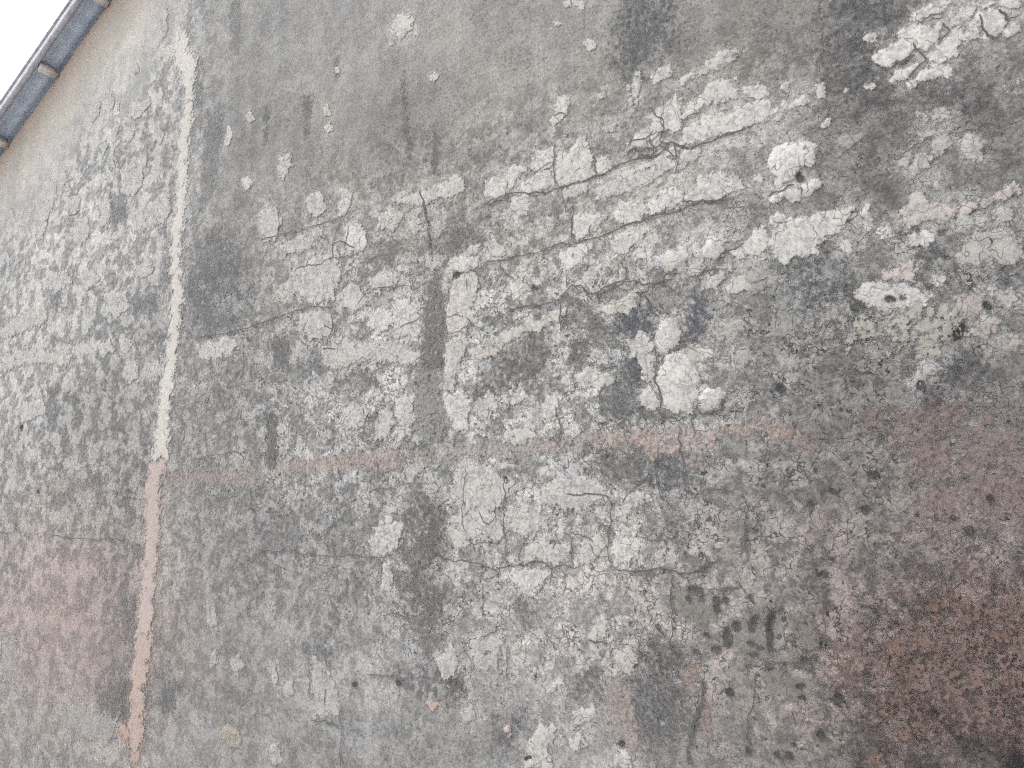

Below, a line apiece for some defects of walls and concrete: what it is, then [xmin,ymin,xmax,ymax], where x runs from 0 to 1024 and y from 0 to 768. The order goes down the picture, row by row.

damp [610,0,677,81]
damp [813,0,907,112]
peeling [863,0,1022,89]
damp [192,64,224,212]
crack [256,207,360,270]
crack [449,102,802,334]
peeling [484,47,826,273]
peeling [682,106,1024,390]
damp [914,230,970,272]
crack [192,301,343,350]
peeling [446,459,654,596]
crack [433,344,749,652]